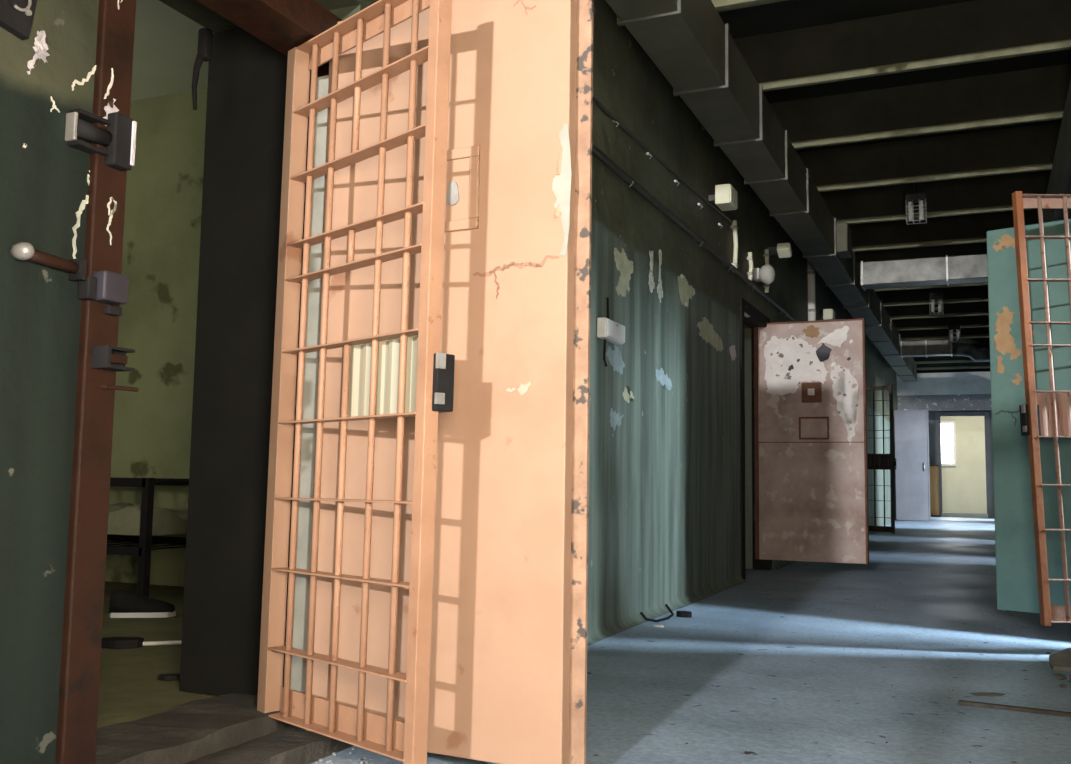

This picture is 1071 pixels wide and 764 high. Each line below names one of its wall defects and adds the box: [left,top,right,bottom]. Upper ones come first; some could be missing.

peeling [552,123,572,258]
crack [473,255,559,299]
peeling [614,247,634,297]
peeling [648,250,663,303]
peeling [678,274,695,307]
peeling [697,317,736,361]
peeling [606,344,634,431]
peeling [655,368,673,390]
peeling [764,326,858,445]